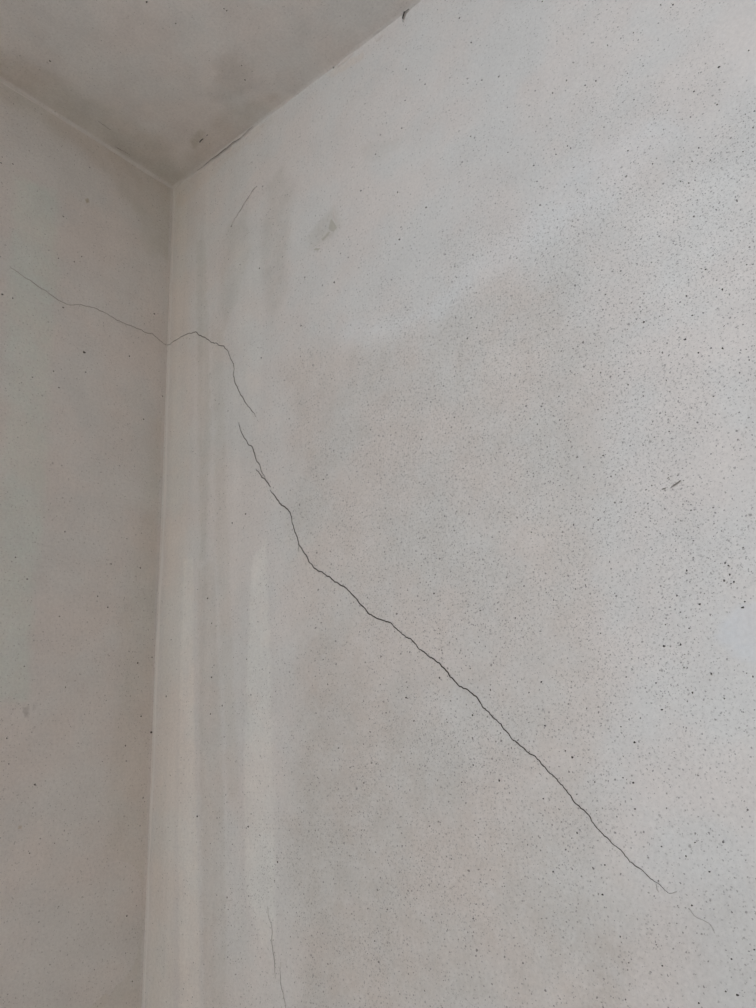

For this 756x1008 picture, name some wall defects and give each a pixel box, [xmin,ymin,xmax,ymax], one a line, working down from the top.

crack [10,267,715,933]